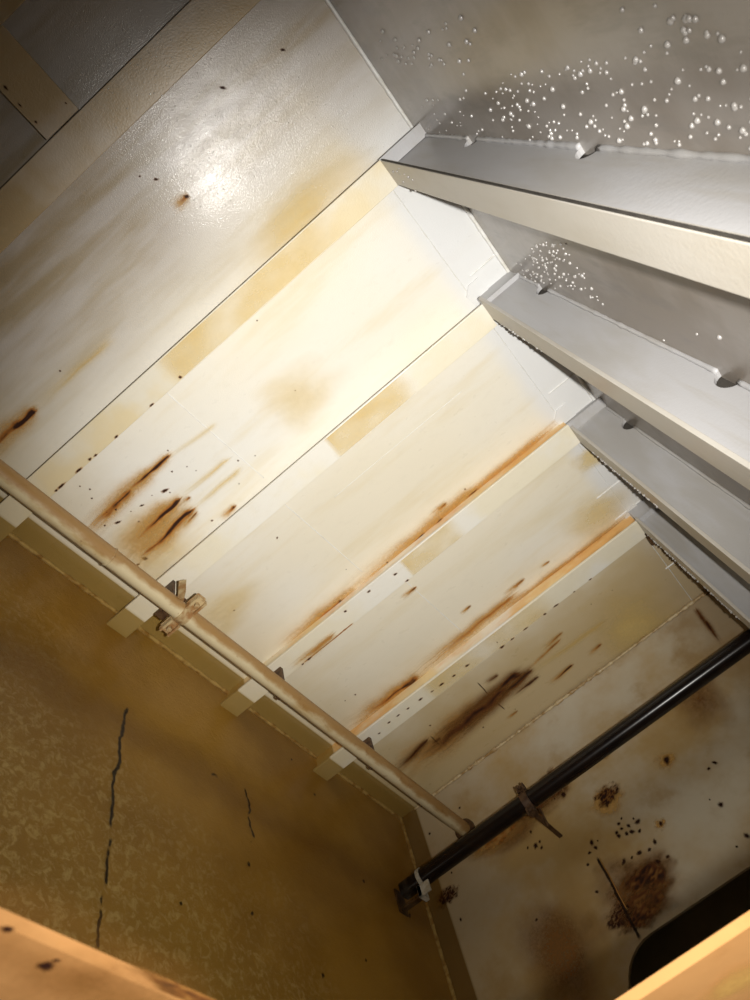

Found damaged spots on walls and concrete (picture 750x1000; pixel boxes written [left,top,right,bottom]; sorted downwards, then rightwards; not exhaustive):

rust [0,407,37,444]
rust [91,450,197,566]
rust [370,431,548,576]
rust [301,624,352,665]
rust [305,591,352,630]
rust [366,675,418,717]
rust [403,625,599,764]
rust [433,520,622,663]
crack [96,709,128,947]
crack [245,790,255,837]
rust [594,784,641,838]
rust [595,820,672,930]